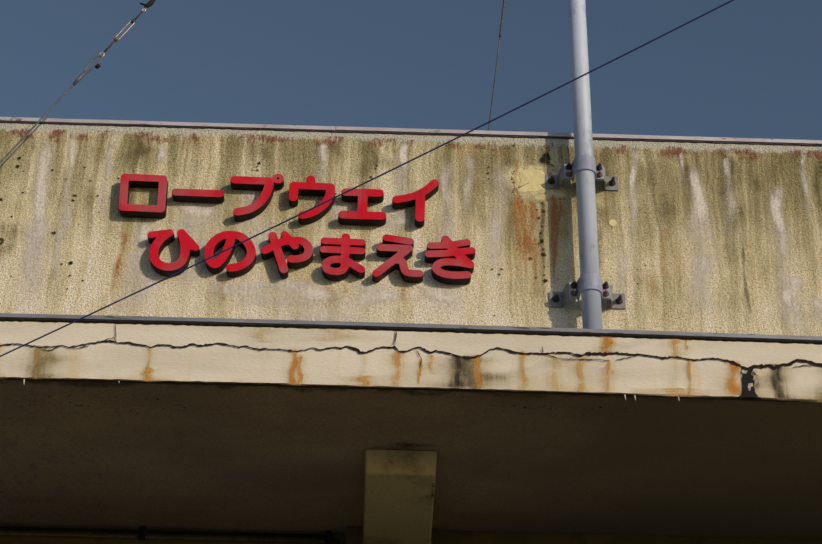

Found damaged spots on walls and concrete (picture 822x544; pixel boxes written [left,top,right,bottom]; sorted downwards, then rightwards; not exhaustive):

damp [129,223,151,274]
damp [179,203,216,230]
rust [513,190,539,272]
rust [551,196,562,263]
damp [679,153,708,240]
damp [770,190,786,263]
damp [425,287,460,303]
rust [289,349,303,384]
crack [0,322,822,370]
damp [449,356,505,388]
rust [727,361,740,394]
damp [771,364,788,399]